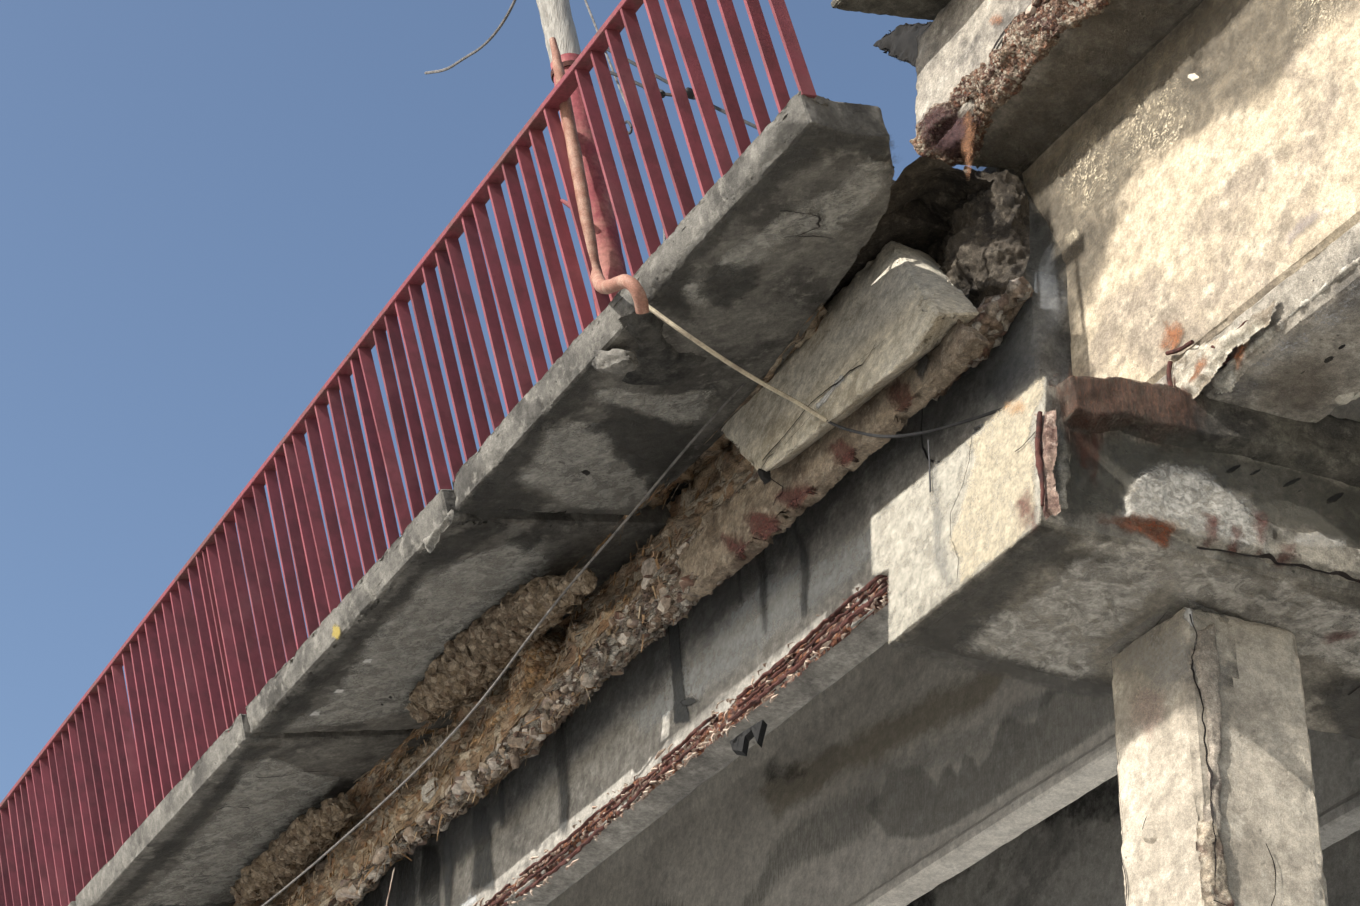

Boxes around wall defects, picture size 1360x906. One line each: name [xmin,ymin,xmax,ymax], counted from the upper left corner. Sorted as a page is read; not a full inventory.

spalling [909,0,1111,308]
spalling [1165,257,1360,399]
spalling [757,468,771,485]
leakage [357,0,1360,906]
corrosion [1050,362,1205,460]
spalling [422,509,454,553]
corrosion [1117,516,1175,547]
crack [1197,546,1360,583]
corrosion [473,574,891,906]
crack [1189,614,1227,906]
crack [1266,844,1276,906]